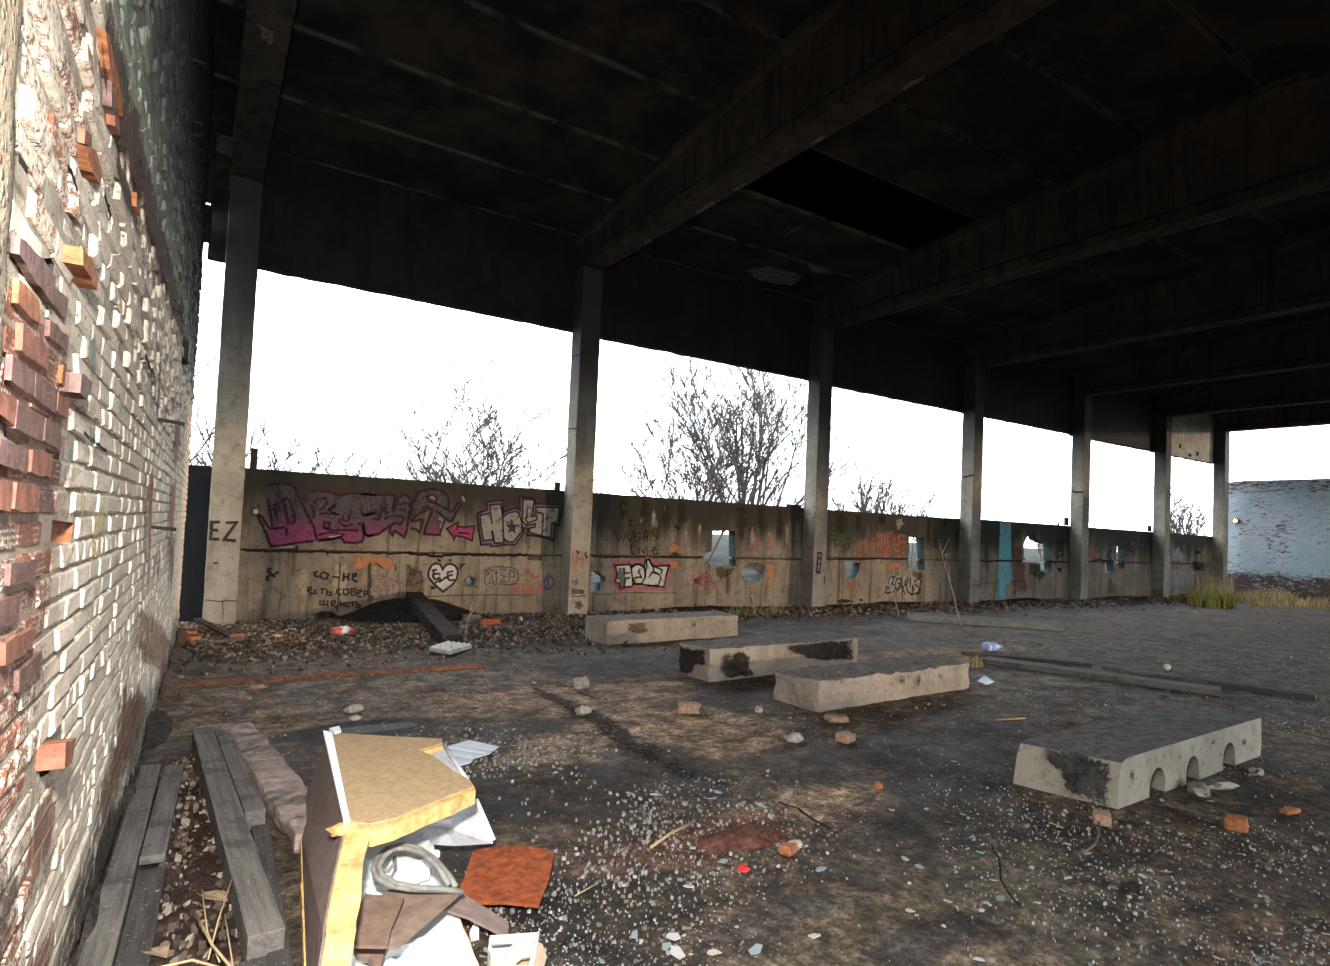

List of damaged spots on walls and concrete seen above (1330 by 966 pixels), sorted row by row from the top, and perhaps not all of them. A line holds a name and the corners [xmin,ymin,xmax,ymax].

spalling [76,0,186,350]
peeling [0,236,98,543]
peeling [0,559,42,692]
spalling [137,609,171,671]
spalling [96,683,146,827]
leakage [0,854,18,949]